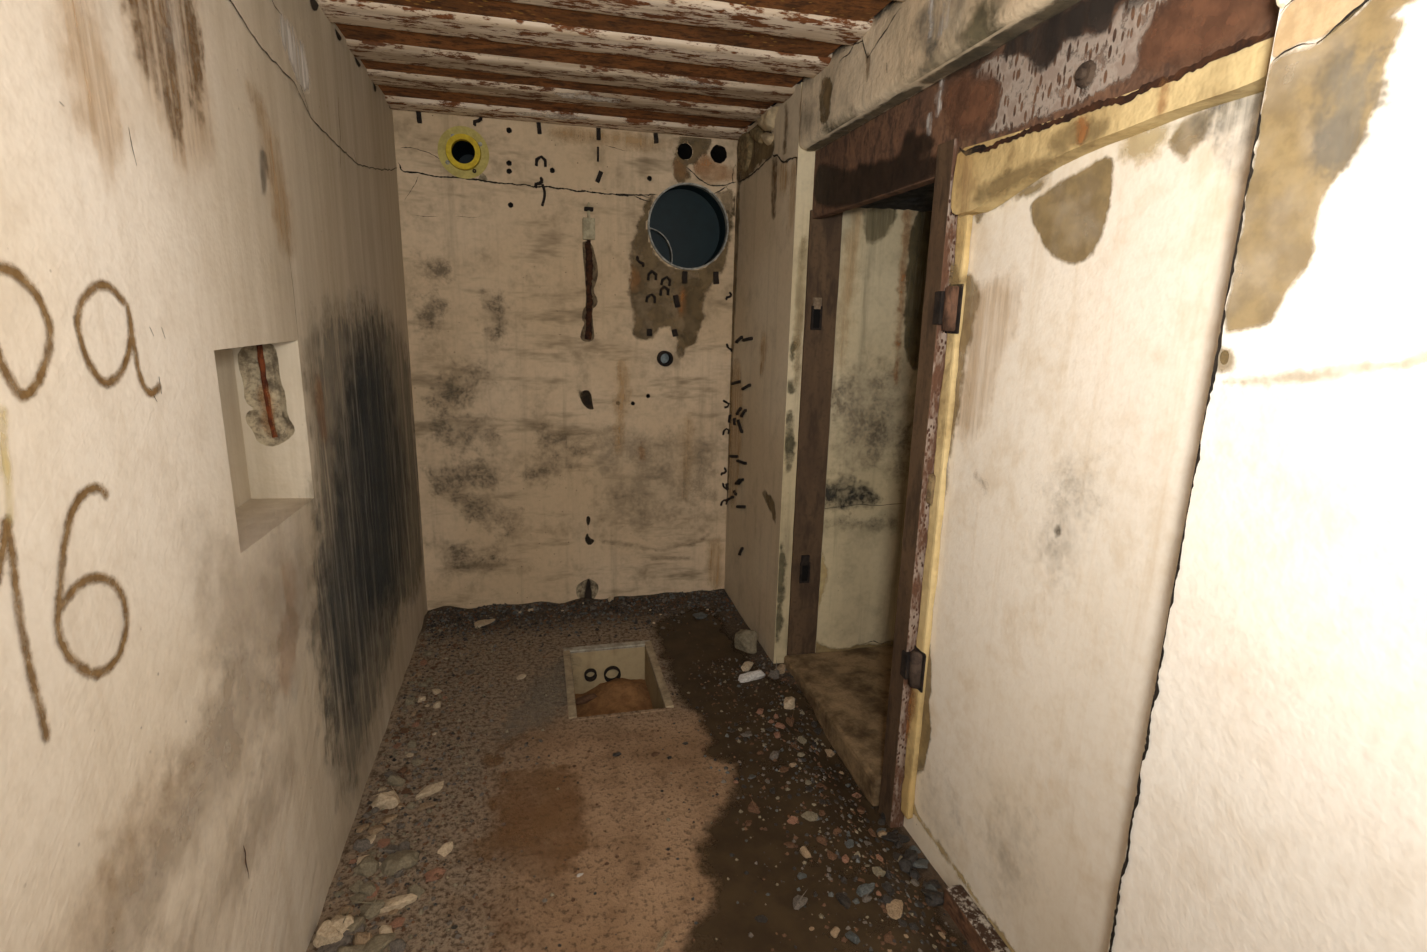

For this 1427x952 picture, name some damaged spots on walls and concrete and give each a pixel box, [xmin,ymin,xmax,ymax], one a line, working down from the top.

peeling [976,0,1167,132]
flaking render [1273,0,1364,57]
water stain [976,117,1113,264]
water stain [1128,0,1413,331]
water stain [306,309,496,785]